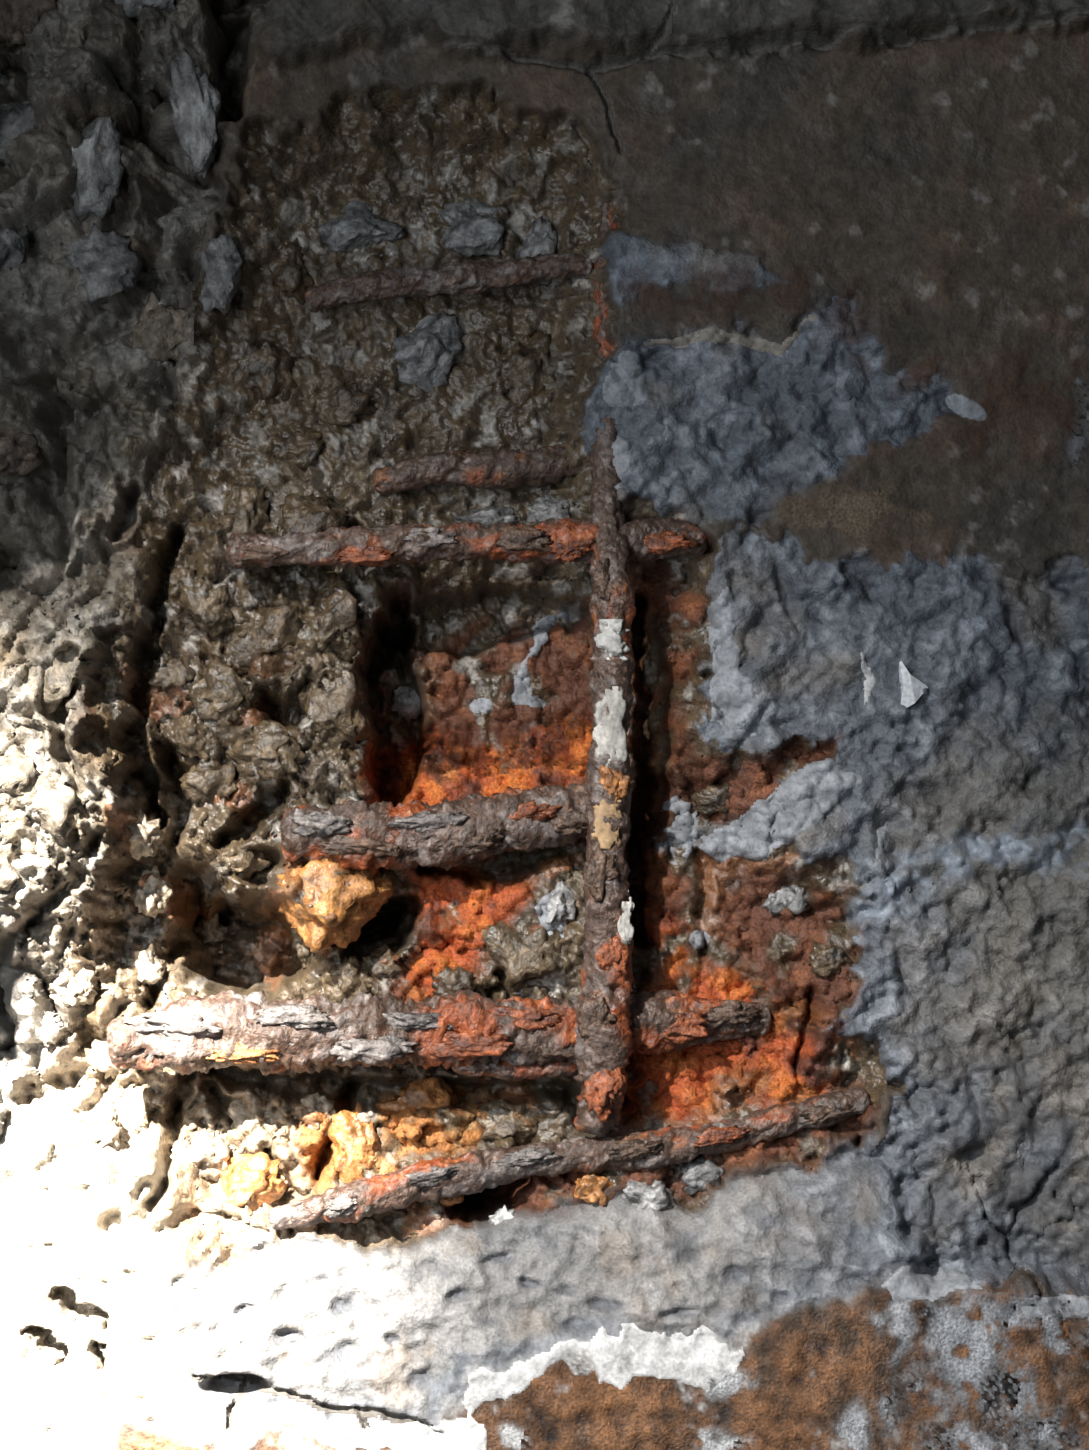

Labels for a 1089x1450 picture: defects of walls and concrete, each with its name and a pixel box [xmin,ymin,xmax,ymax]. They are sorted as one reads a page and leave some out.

corrosion [364,619,594,807]
spalling [18,87,988,1270]
corrosion [622,565,858,1123]
corrosion [396,868,531,1003]
peeling [164,523,1089,1450]
corrosion [298,1096,351,1193]
corrosion [368,1060,578,1175]
corrosion [465,1172,591,1216]
corrosion [622,1165,691,1198]
spalling [19,1286,108,1373]
corrosion [457,1271,1089,1450]
corrosion [118,1425,391,1450]